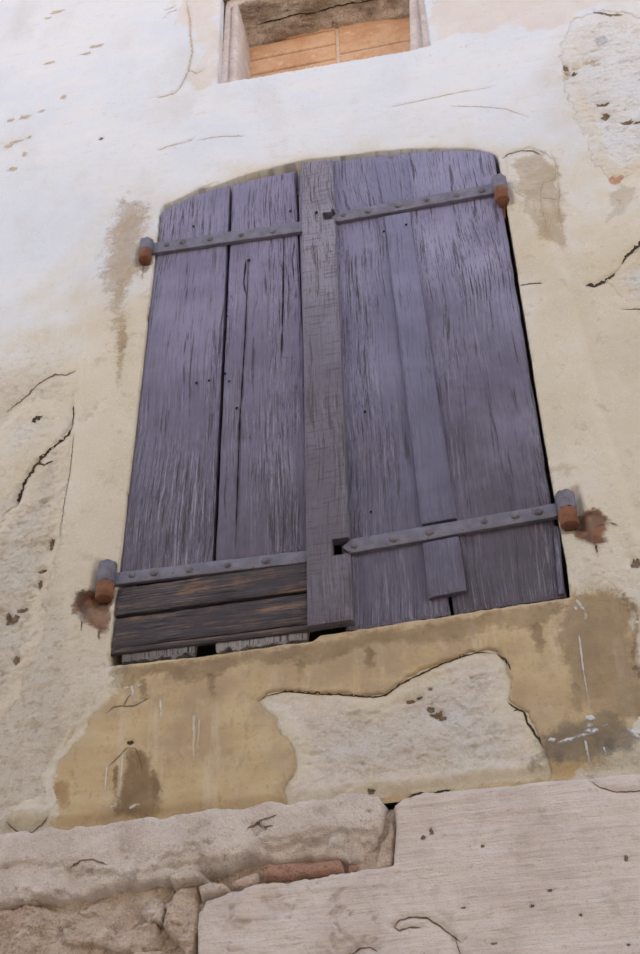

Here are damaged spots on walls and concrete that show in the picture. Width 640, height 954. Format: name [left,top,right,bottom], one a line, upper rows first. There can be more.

spalling [563,60,600,79]
crack [586,241,640,288]
spalling [606,247,640,307]
crack [18,406,74,538]
corrosion [574,508,617,552]
spalling [0,429,72,721]
corrosion [72,590,112,638]
spalling [260,650,608,805]
peeling [625,716,640,738]